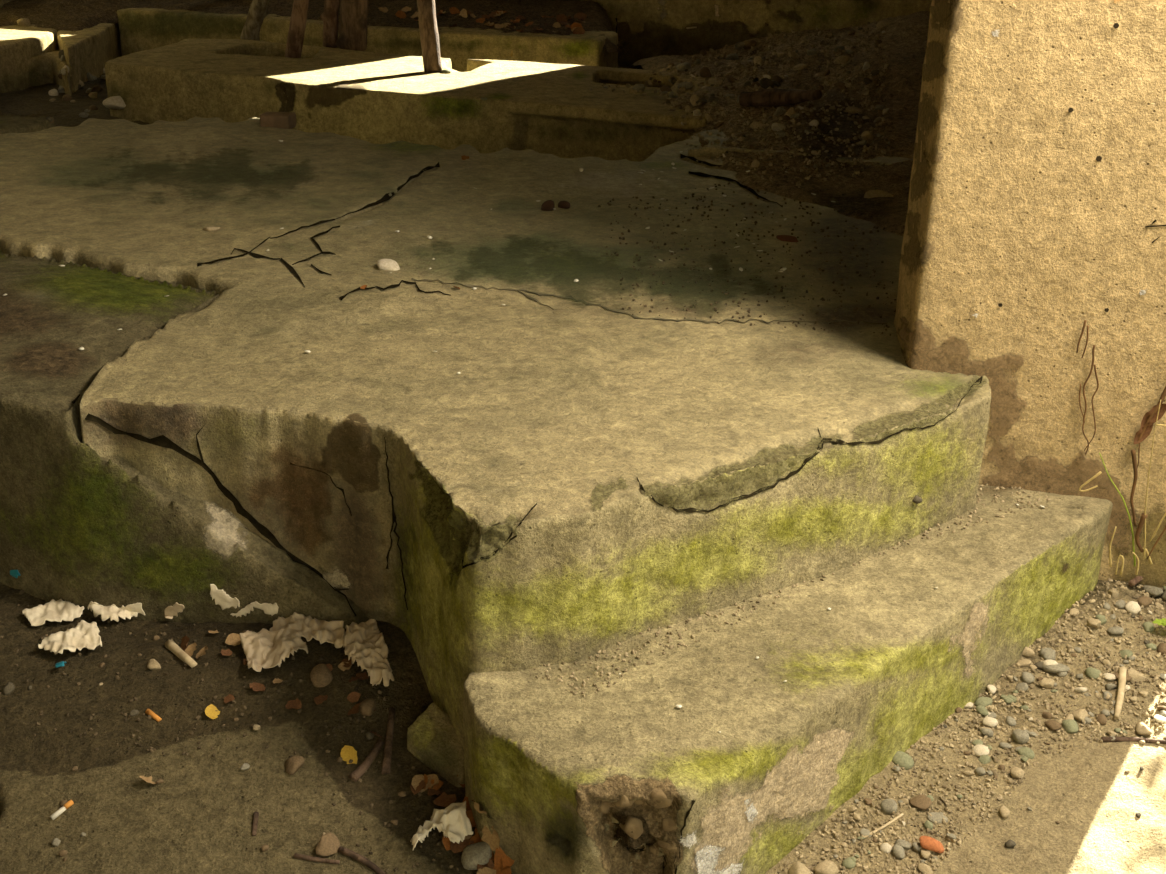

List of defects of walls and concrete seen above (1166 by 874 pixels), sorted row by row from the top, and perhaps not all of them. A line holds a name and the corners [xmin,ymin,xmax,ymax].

crack [197,162,887,324]
crack [72,394,356,617]
crack [637,376,983,513]
spalling [575,729,853,874]